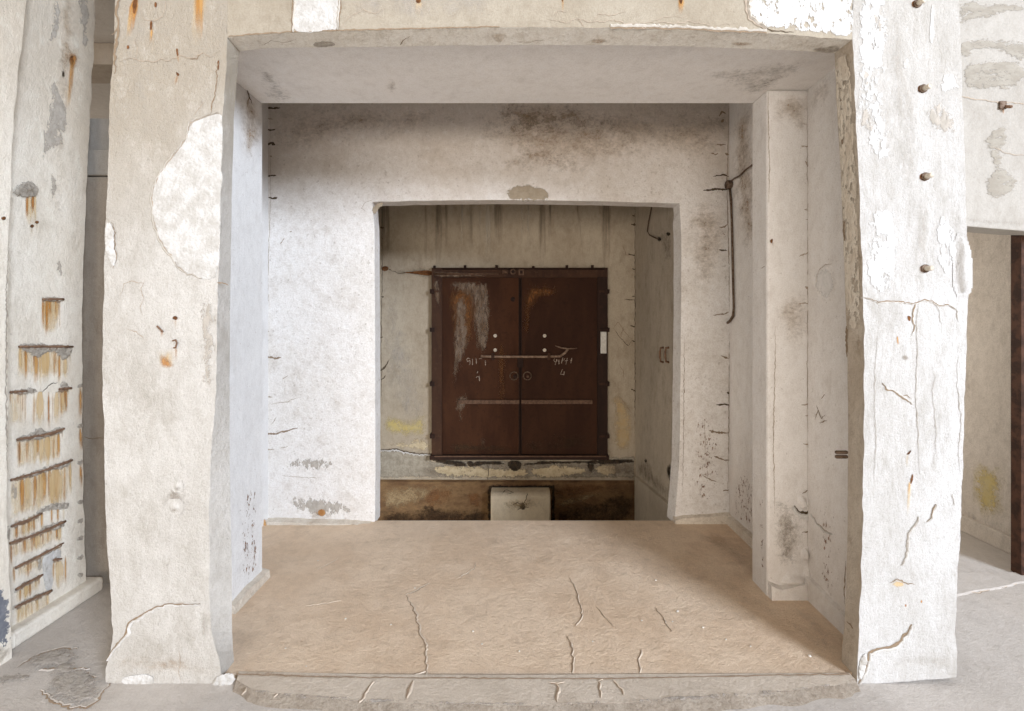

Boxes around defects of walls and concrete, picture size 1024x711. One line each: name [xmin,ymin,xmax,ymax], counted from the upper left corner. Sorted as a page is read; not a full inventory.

corrosion [129,0,138,20]
spalling [44,82,67,153]
flaking render [149,112,223,279]
peeling [744,0,897,356]
peeling [928,38,1024,132]
peeling [985,128,1017,198]
crack [865,297,962,481]
crack [901,494,954,566]
crack [106,603,200,661]
crack [237,579,914,703]